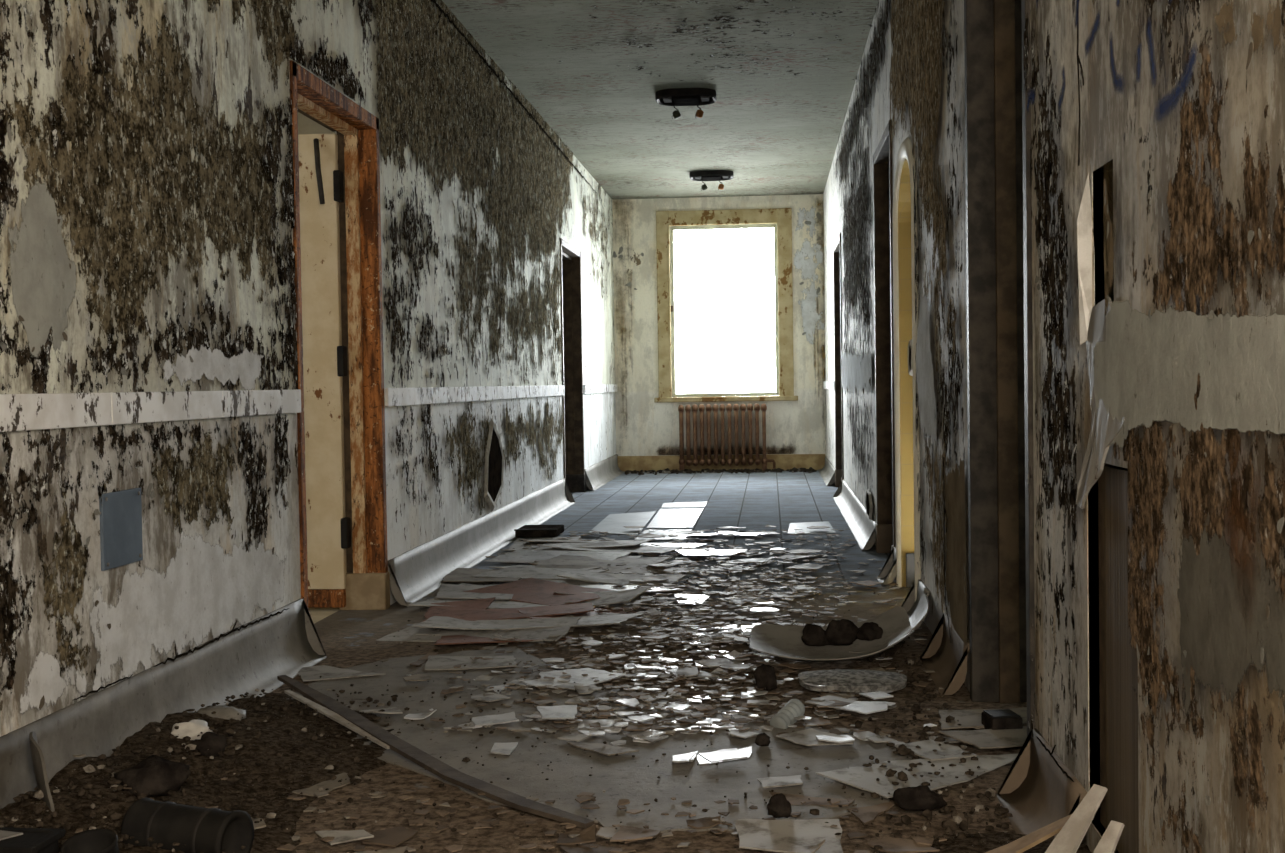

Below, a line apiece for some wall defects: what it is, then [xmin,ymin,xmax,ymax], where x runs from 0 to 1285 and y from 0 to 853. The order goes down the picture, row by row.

peeling [0,0,644,540]
peeling [574,0,843,90]
flaking render [1024,0,1285,853]